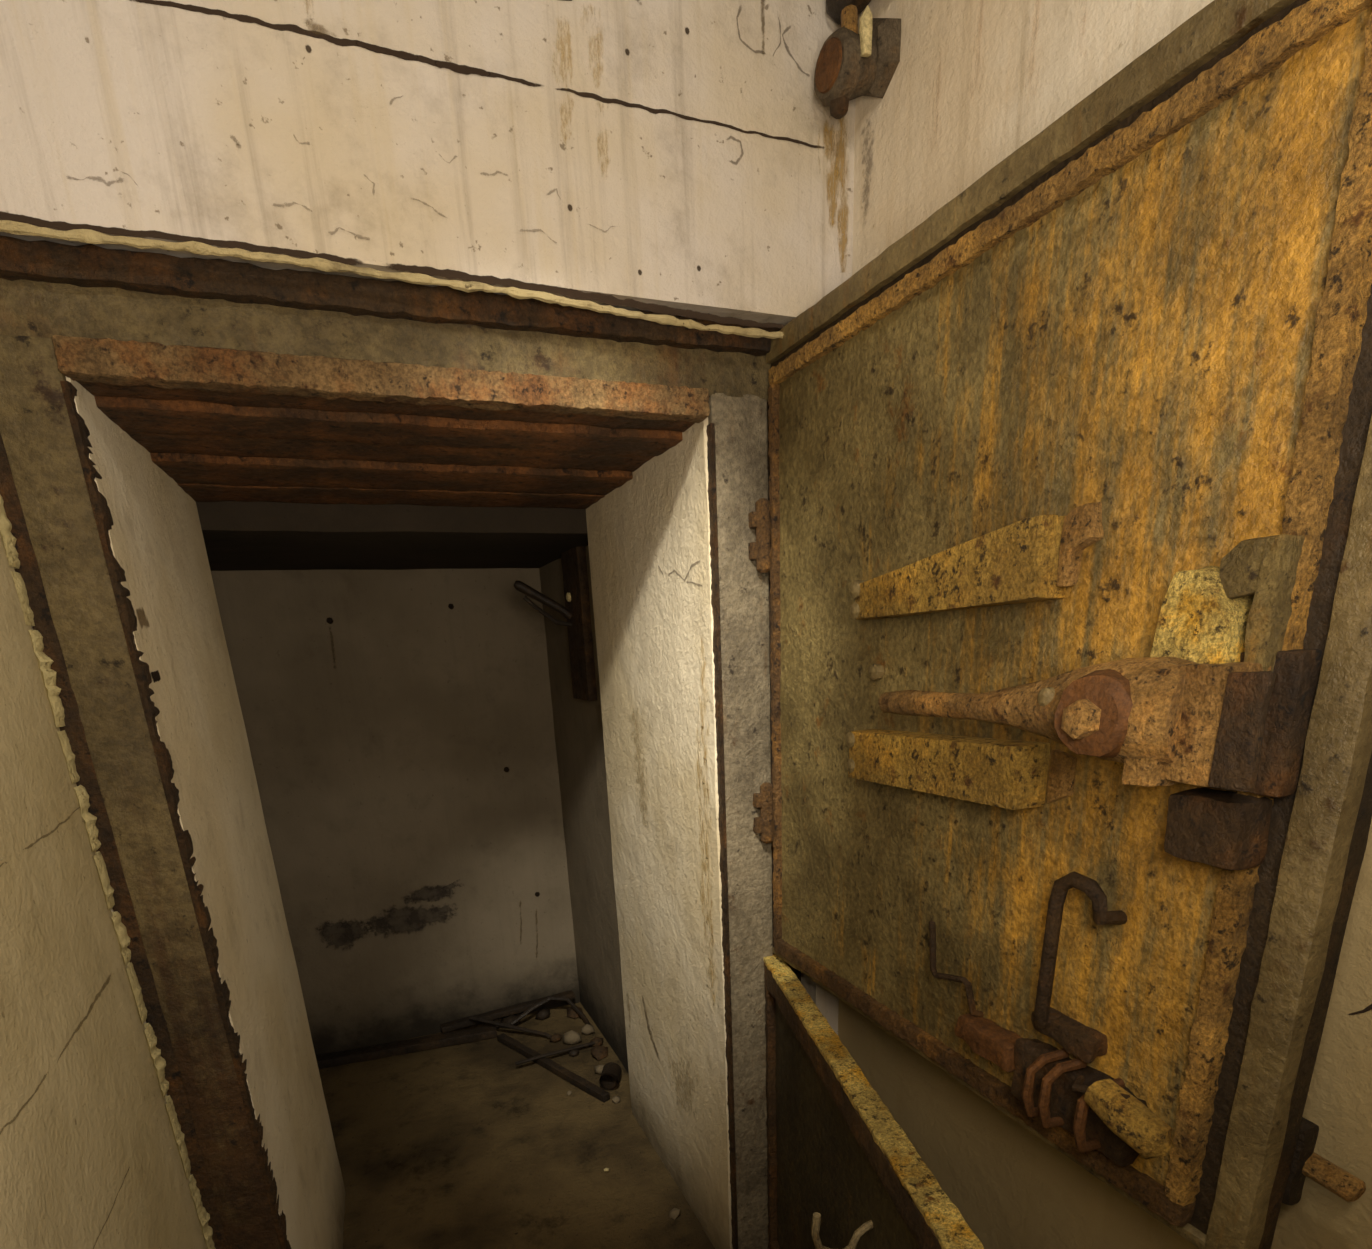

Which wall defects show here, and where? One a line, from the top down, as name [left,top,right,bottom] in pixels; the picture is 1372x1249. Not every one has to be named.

crack [130,0,824,148]
rust [824,117,848,271]
crack [0,807,80,866]
flaking render [0,495,216,1249]
peeling [316,882,461,950]
crack [0,977,110,1134]